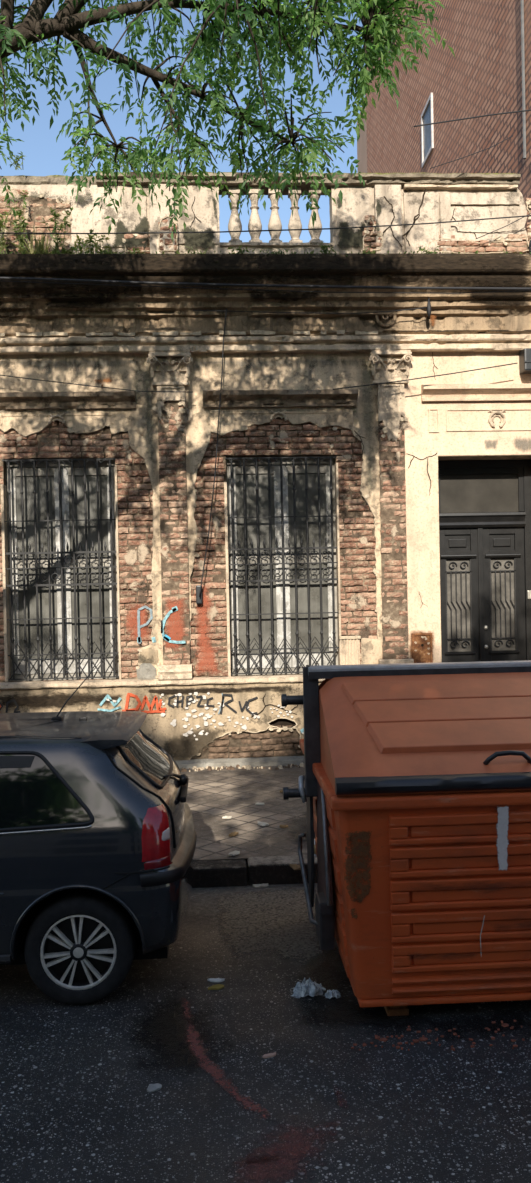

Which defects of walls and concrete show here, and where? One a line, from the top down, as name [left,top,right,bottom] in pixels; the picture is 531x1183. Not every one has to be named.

flaking render [0,188,72,254]
flaking render [0,398,430,682]
flaking render [160,692,304,760]